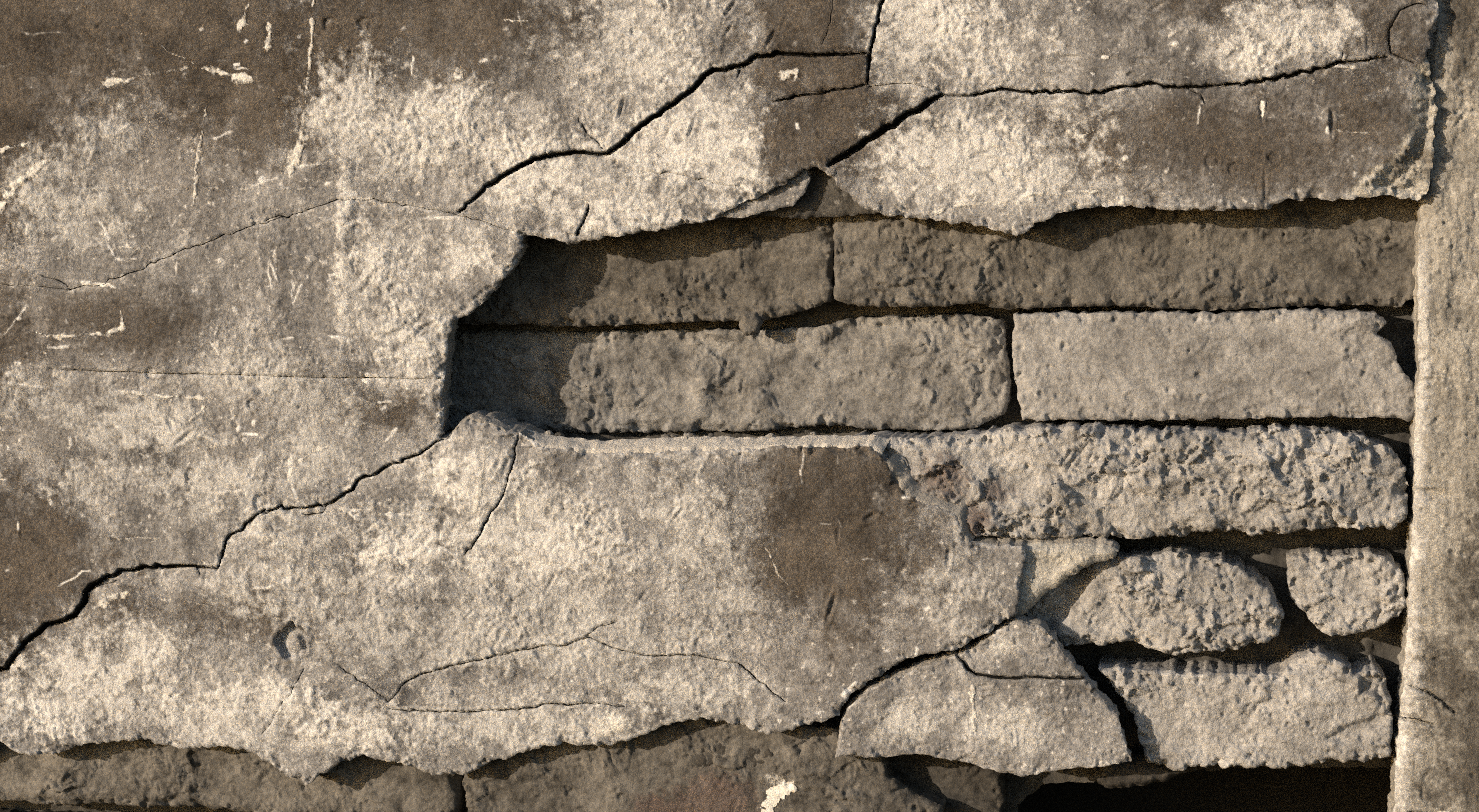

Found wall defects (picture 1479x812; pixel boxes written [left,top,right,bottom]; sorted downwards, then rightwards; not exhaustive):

crack [6,0,1422,290]
peeling [702,167,878,223]
crack [0,439,442,670]
crack [339,621,785,713]
spalling [439,234,1166,766]